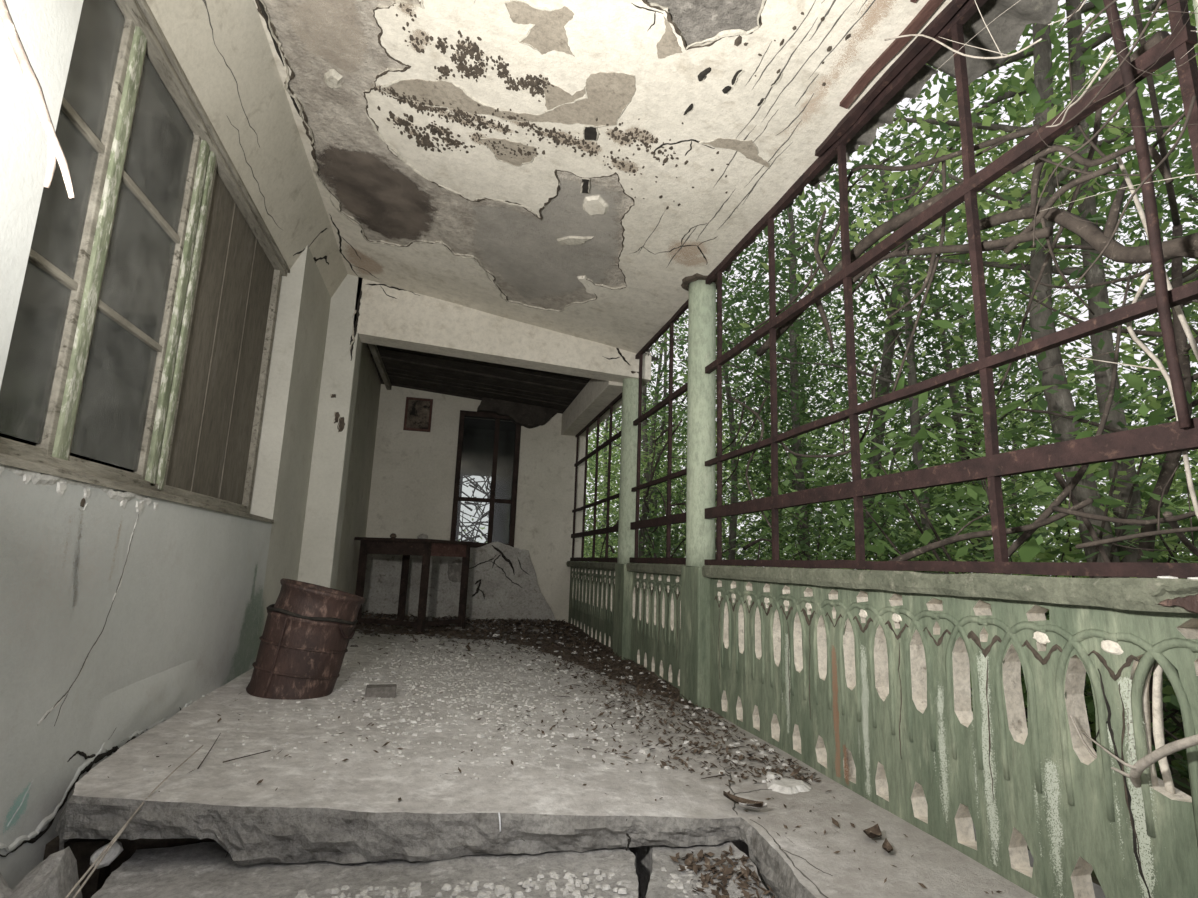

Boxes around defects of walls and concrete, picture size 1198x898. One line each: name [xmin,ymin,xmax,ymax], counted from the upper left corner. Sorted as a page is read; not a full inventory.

crack [203,0,420,360]
damp [316,142,438,242]
flaking render [255,0,689,312]
flaking render [642,0,766,59]
crack [632,0,875,267]
crack [37,514,139,726]
crack [0,693,208,857]
crack [1094,669,1151,898]